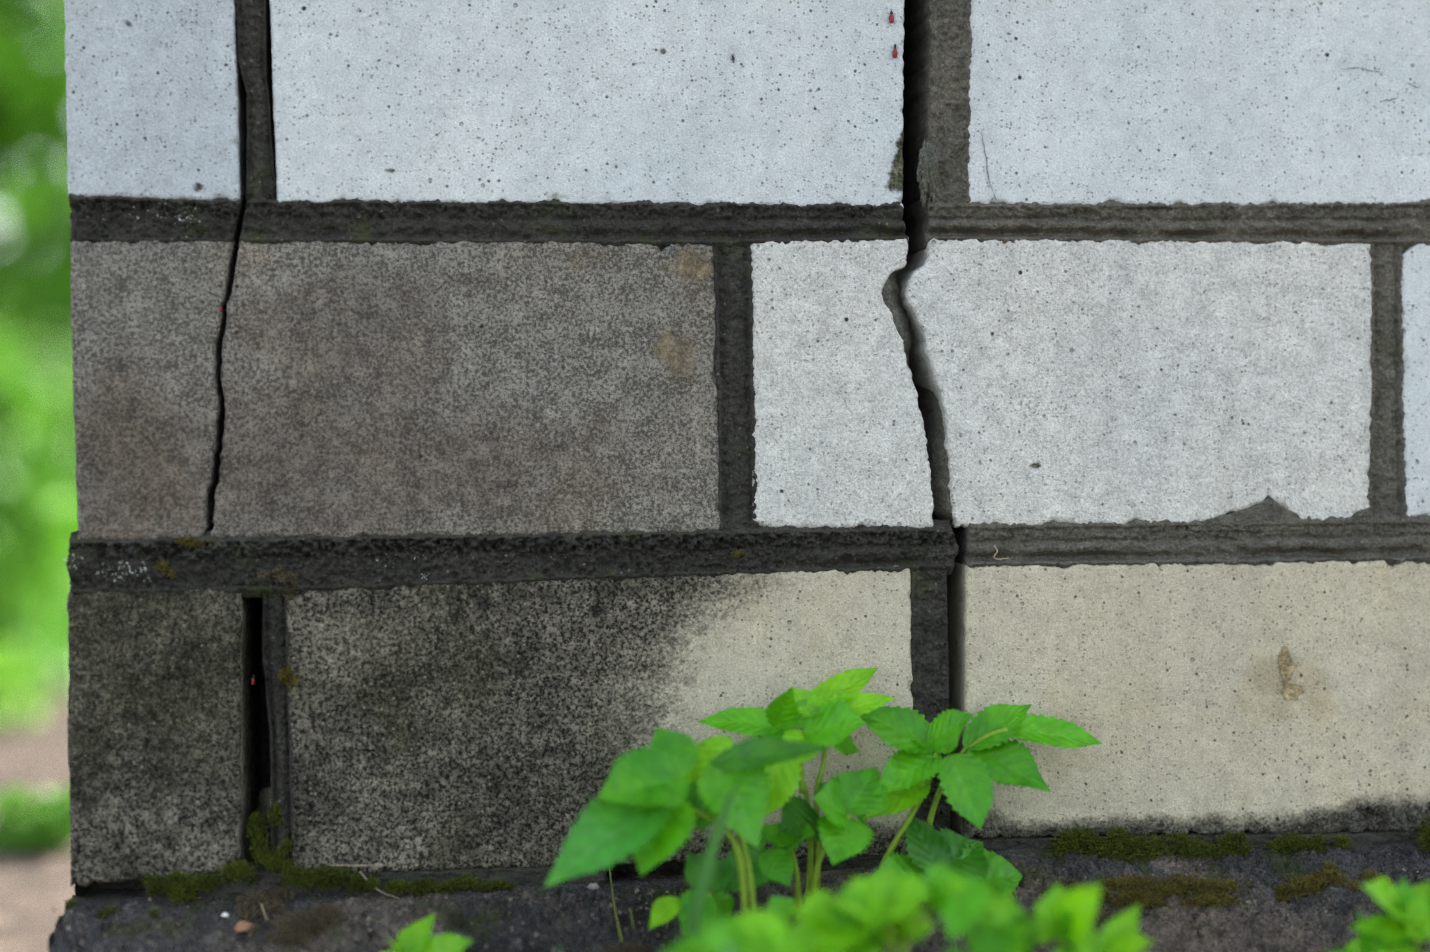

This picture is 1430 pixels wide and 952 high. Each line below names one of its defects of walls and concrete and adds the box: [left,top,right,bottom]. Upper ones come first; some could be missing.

crack [881,228,954,528]
damp [67,585,242,886]
damp [286,573,781,874]
damp [761,830,829,858]
damp [855,826,909,856]